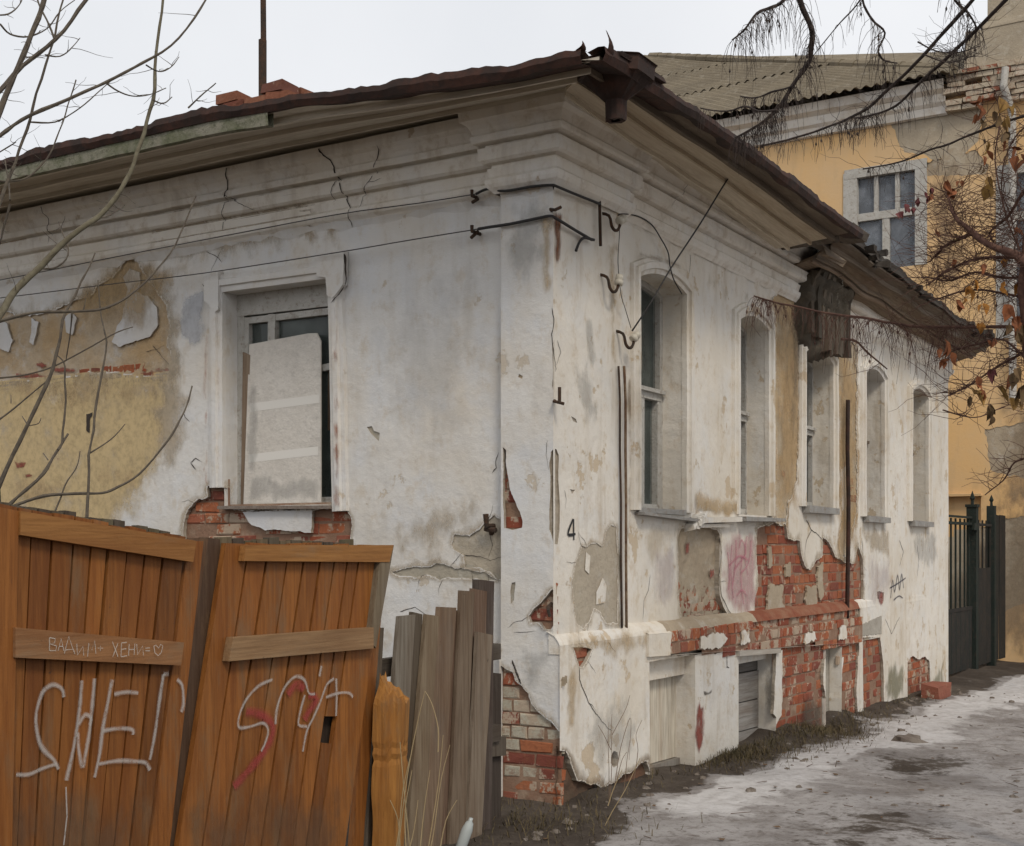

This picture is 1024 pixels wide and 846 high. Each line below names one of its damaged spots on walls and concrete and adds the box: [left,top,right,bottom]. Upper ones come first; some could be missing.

crack [202,168,254,286]
crack [318,146,380,225]
flaking render [0,259,176,386]
spalling [180,479,352,542]
flaking render [390,450,523,603]
spalling [666,294,883,728]
spalling [507,583,559,634]
spalling [502,660,652,805]
flaking render [561,525,620,731]
spalling [907,656,951,700]